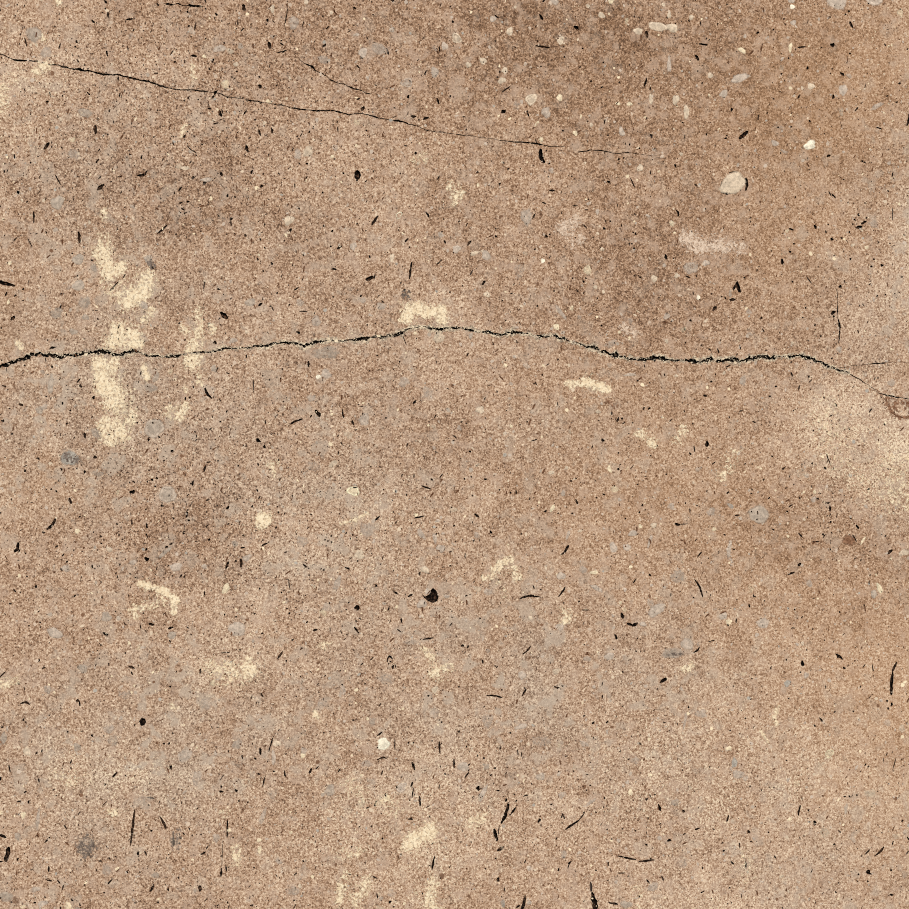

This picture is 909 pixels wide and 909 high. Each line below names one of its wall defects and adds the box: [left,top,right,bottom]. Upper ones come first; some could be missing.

crack [163,1,204,9]
crack [0,3,651,156]
crack [834,289,842,343]
crack [0,324,908,419]